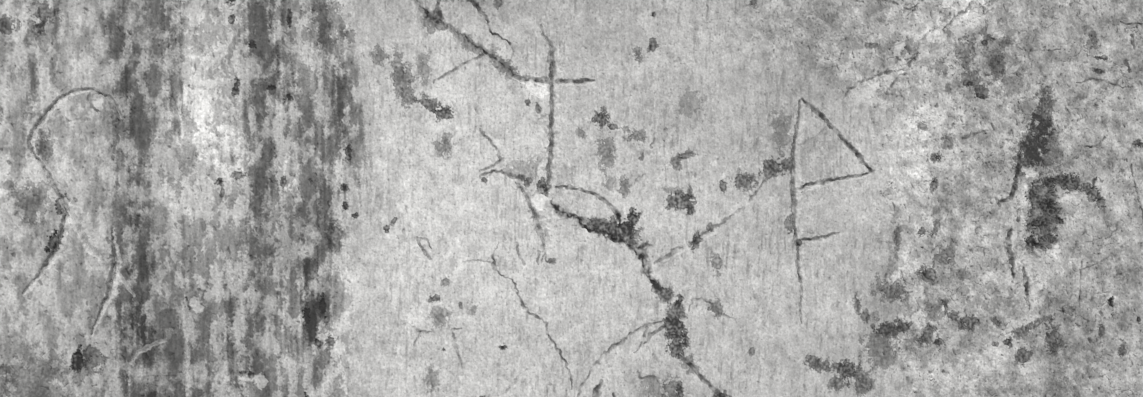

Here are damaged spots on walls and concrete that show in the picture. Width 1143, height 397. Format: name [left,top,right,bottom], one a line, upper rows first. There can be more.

leakage [0,0,62,161]
crack [411,0,521,84]
crack [841,0,996,101]
crack [479,128,502,159]
leakage [0,175,52,230]
leakage [100,0,456,397]
crack [415,236,432,261]
crack [461,165,791,397]
leakage [0,336,83,397]
crack [402,322,463,397]